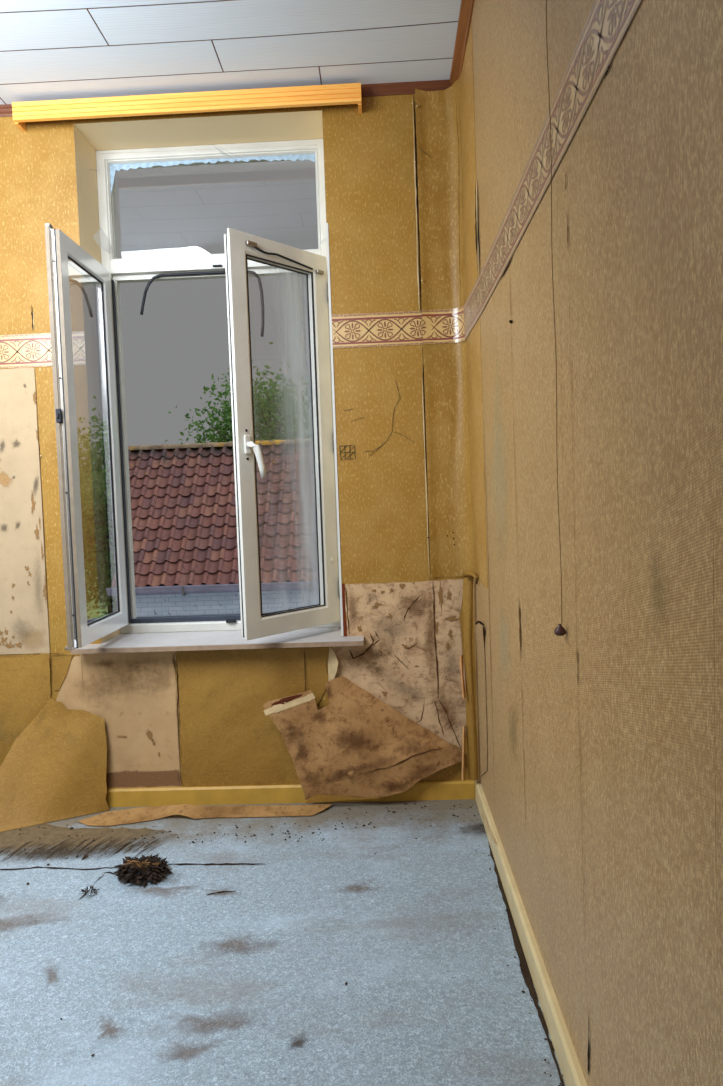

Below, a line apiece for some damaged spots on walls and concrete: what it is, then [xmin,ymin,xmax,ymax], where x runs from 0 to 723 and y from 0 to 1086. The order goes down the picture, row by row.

flaking render [0,368,50,655]
flaking render [56,651,182,788]
flaking render [332,579,466,750]